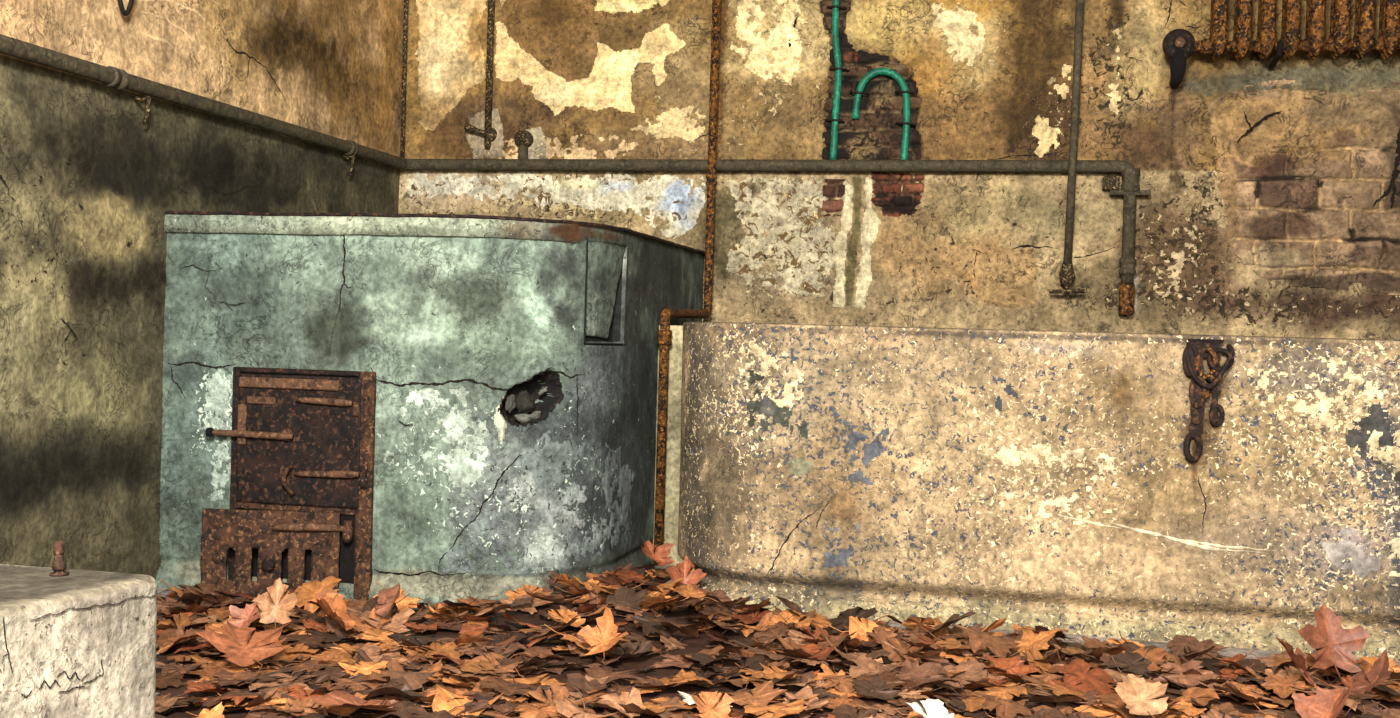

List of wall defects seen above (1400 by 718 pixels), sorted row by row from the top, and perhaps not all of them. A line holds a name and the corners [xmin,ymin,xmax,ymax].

peeling [407,0,706,239]
corrosion [717,0,727,144]
peeling [726,176,846,297]
spalling [730,0,924,217]
crack [1372,131,1400,208]
crack [374,454,520,576]
crack [370,367,582,435]
peeling [378,371,635,578]
corrosion [1186,358,1223,483]
peeling [1247,355,1400,499]